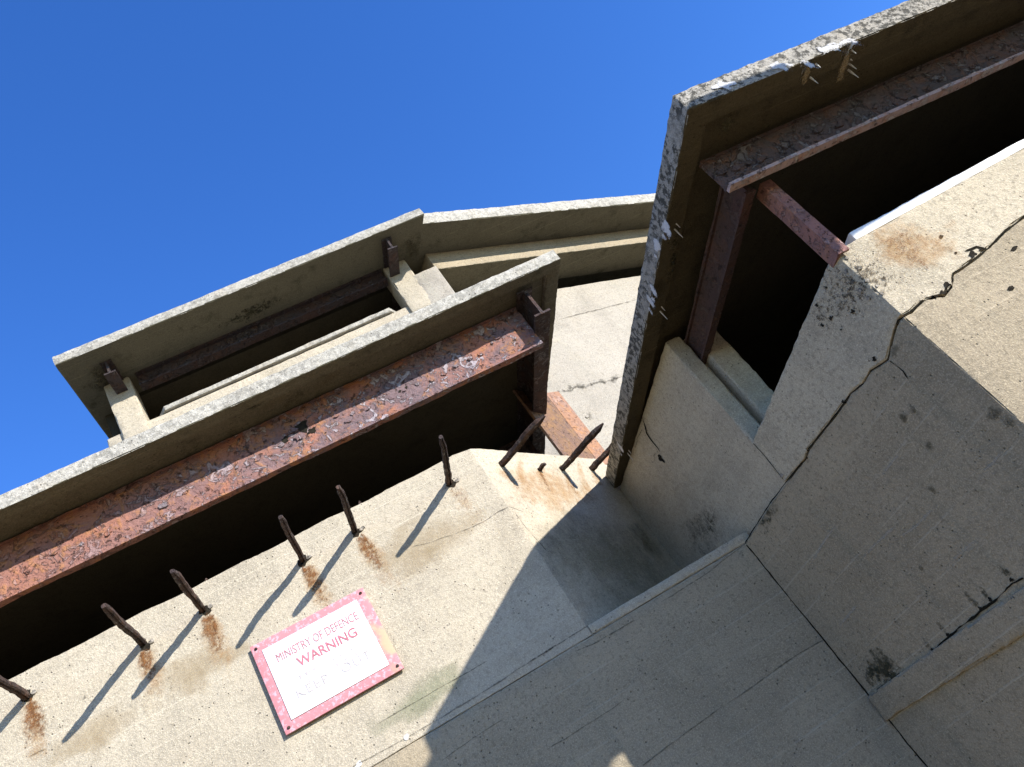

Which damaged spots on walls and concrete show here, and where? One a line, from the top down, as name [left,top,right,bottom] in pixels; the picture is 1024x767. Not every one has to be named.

crack [896,216,1024,325]
spalling [808,245,901,349]
crack [639,418,665,463]
rust [351,526,380,567]
crack [672,356,908,696]
rust [297,555,327,602]
rust [199,604,224,651]
crack [927,568,1023,651]
rust [139,639,156,679]
damp [866,647,899,687]
rust [21,689,46,736]